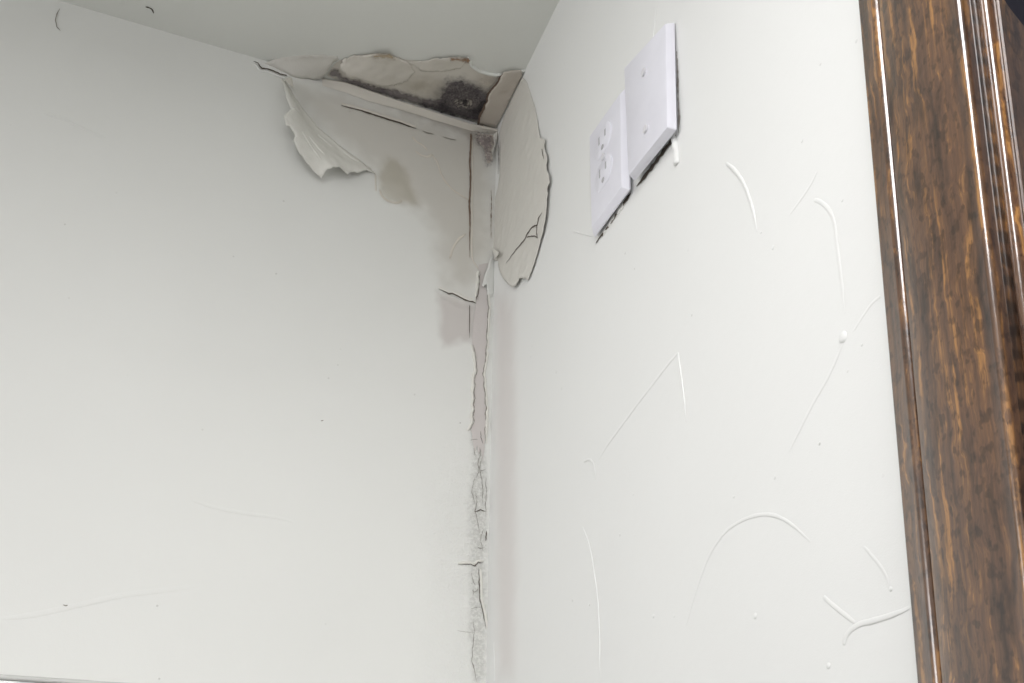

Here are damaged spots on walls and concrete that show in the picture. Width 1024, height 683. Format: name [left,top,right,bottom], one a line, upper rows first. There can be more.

water stain [330,70,487,121]
peeling [265,53,550,459]
crack [458,431,488,680]